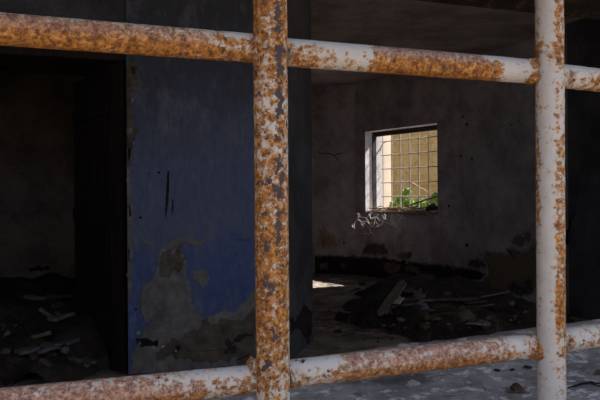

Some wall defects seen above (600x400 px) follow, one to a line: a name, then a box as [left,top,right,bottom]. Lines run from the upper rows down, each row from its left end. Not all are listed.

peeling [126,62,256,374]
leakage [315,231,485,280]